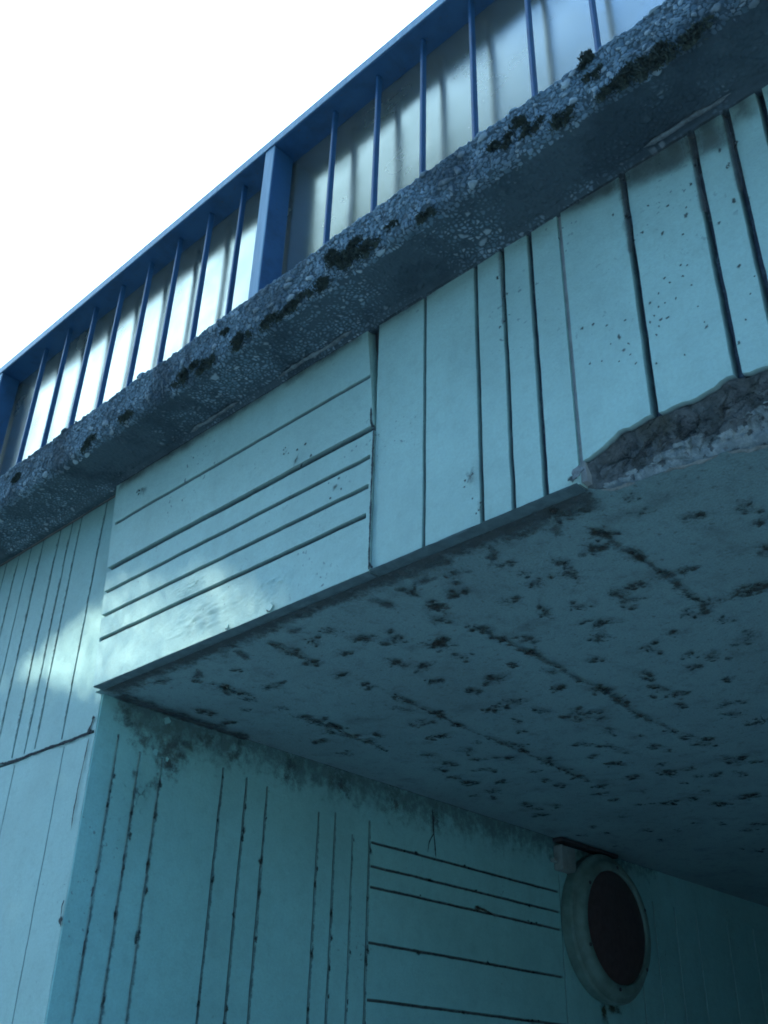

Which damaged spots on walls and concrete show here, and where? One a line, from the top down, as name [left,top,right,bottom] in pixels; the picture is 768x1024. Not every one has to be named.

spalling [567,371,768,491]
water stain [102,492,598,740]
water stain [588,528,699,601]